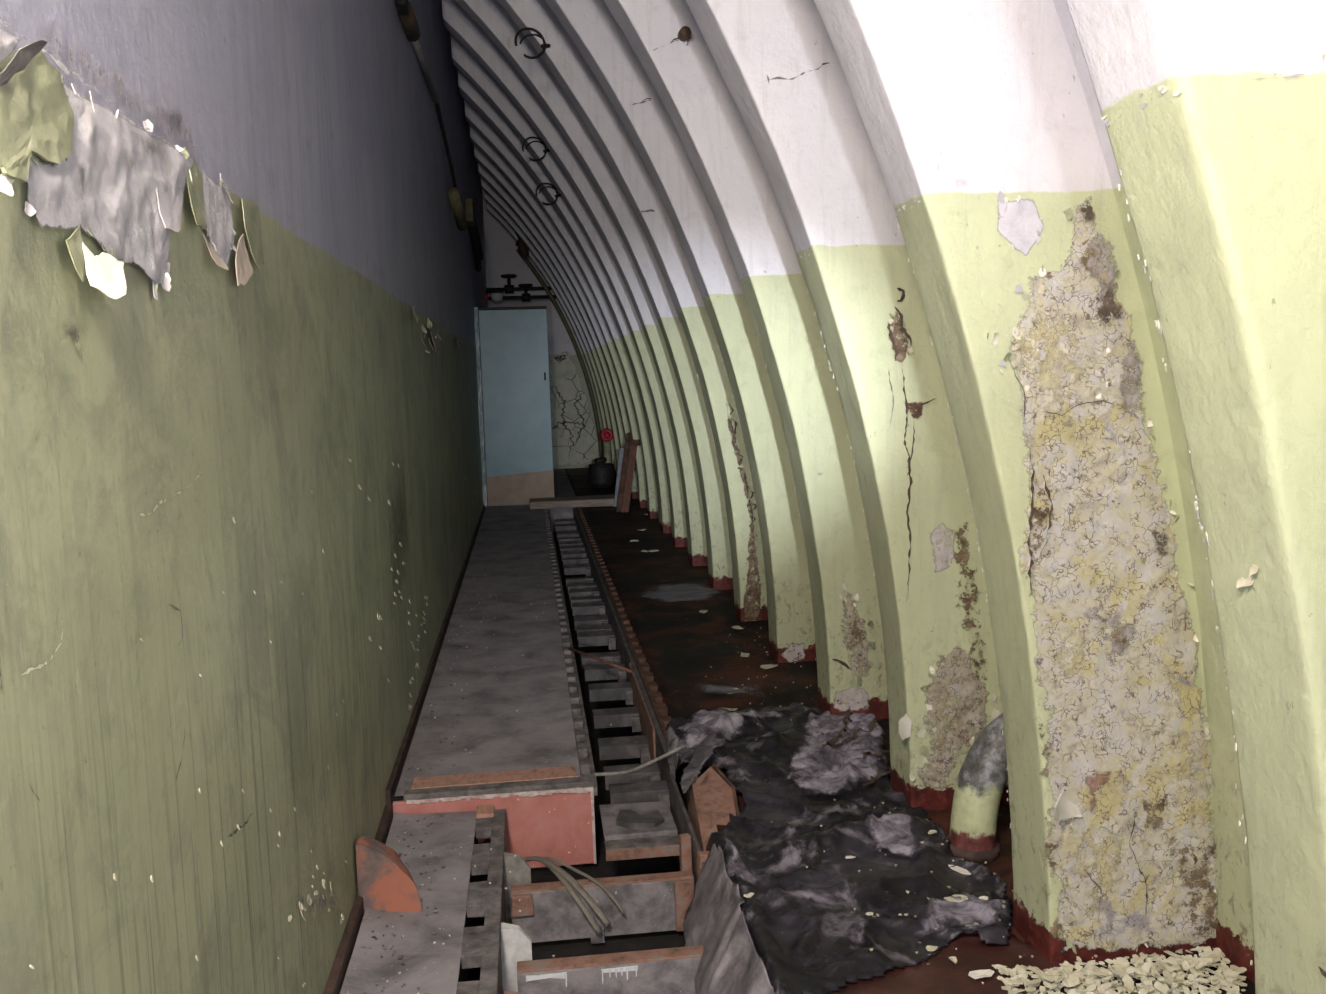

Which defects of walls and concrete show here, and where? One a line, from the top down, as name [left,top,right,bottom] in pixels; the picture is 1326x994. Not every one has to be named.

peeling [0,18,264,301]
spalling [834,584,881,711]
crack [889,370,936,597]
spalling [898,489,1003,790]
spalling [987,191,1218,954]
spalling [1237,565,1258,588]